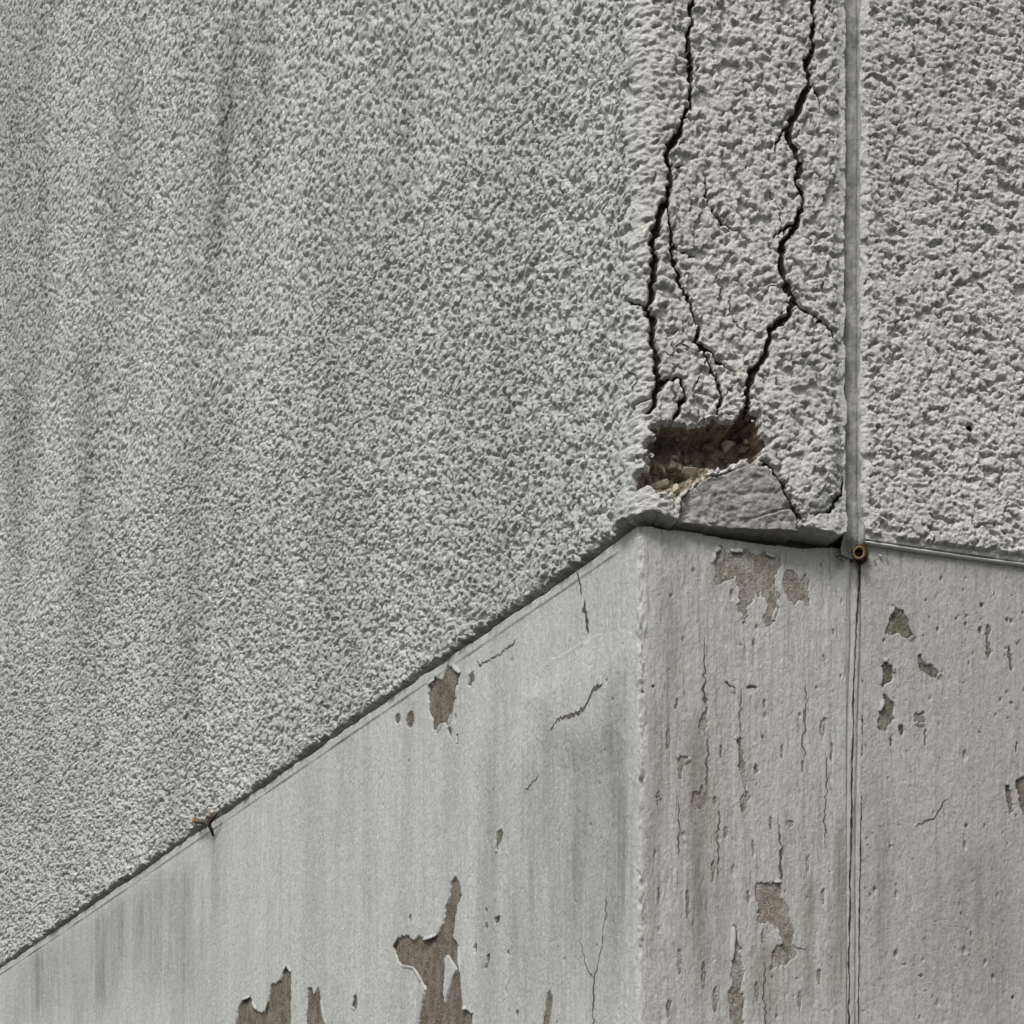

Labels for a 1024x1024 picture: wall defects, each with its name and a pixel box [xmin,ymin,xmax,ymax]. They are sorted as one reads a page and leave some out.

crack [626,0,839,420]
spalling [636,408,810,627]
crack [760,460,843,521]
crack [576,571,589,635]
crack [477,639,516,666]
peeling [427,662,475,744]
crack [550,683,603,730]
peeling [877,657,926,746]
crack [776,822,784,879]
peeling [393,878,475,1024]
peeling [747,879,795,970]
peeling [237,963,292,1024]